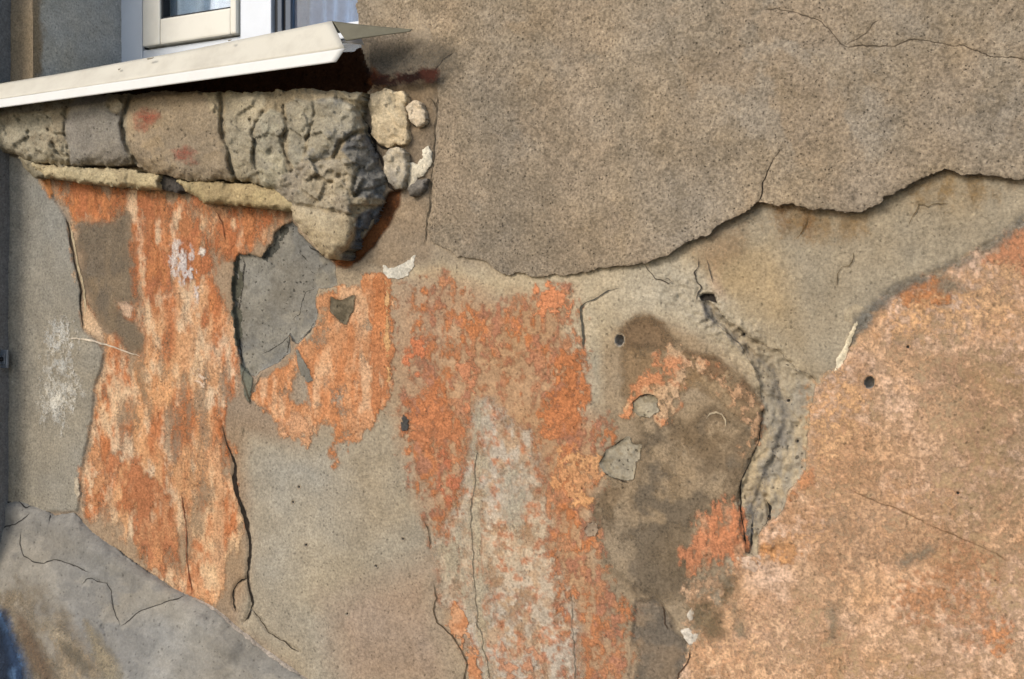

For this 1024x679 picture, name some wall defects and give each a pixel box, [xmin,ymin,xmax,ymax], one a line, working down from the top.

crack [765,8,1024,60]
flaking render [368,88,433,197]
crack [4,496,192,626]
crack [242,367,262,404]
crack [222,426,297,651]
peeling [38,179,1024,679]
damp [592,315,760,679]
crack [739,408,764,544]